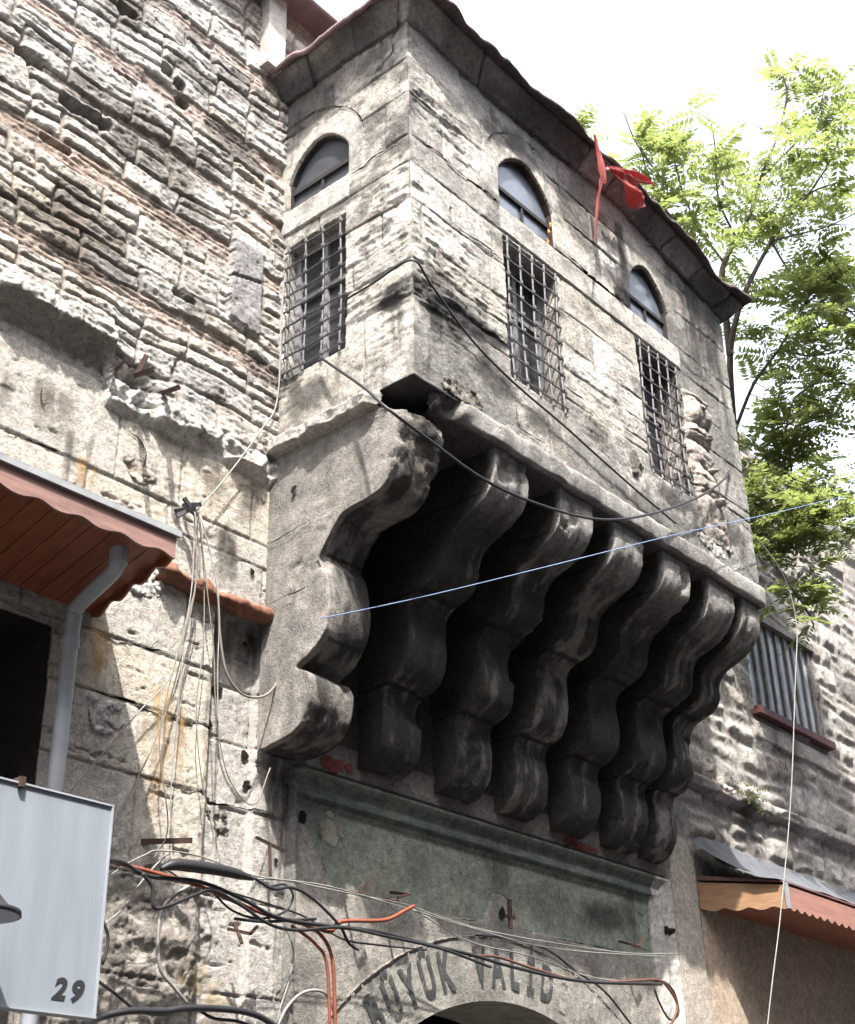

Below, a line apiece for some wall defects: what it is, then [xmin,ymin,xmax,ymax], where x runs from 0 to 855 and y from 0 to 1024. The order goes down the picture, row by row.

crack [287,105,364,130]
spalling [99,367,150,408]
spalling [123,453,158,484]
spalling [697,517,732,558]